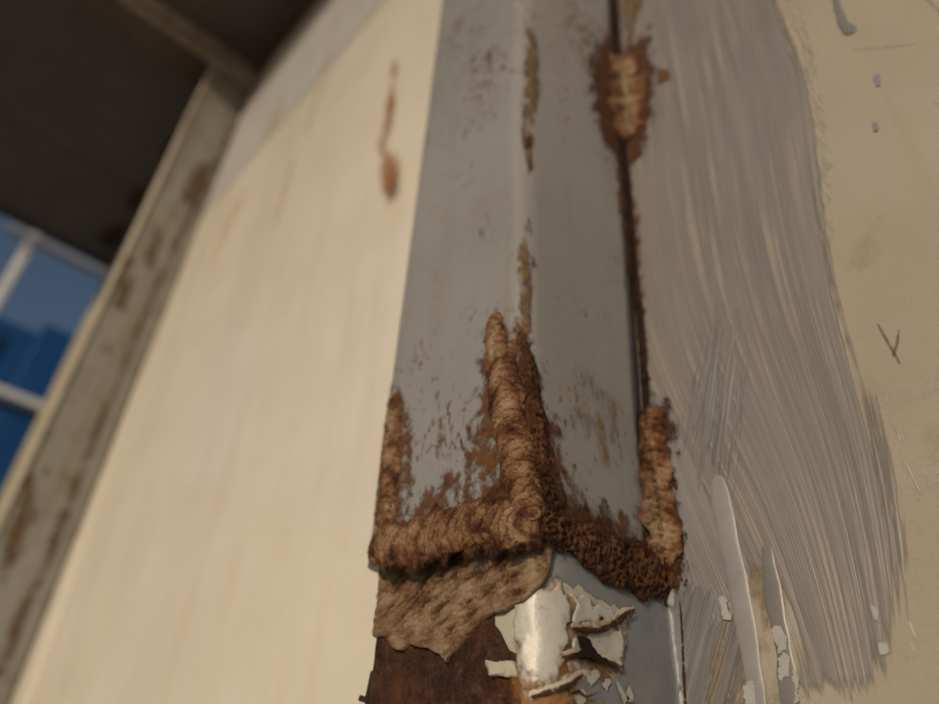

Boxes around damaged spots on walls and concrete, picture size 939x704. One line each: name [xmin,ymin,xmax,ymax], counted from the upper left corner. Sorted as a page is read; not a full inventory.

rust [378,87,399,193]
rust [521,28,540,170]
rust [562,0,670,167]
rust [0,93,250,674]
rust [374,354,511,526]
rust [501,219,651,546]
rust [369,615,576,704]
peeling [372,542,635,704]
rust [669,532,689,592]
peeling [719,595,732,620]
peeling [743,680,756,704]
peeling [771,625,800,703]